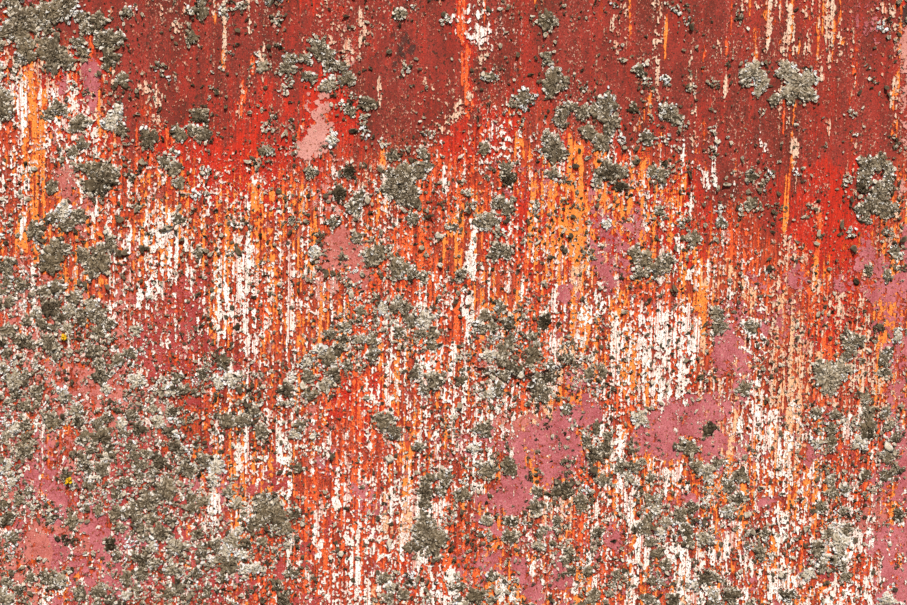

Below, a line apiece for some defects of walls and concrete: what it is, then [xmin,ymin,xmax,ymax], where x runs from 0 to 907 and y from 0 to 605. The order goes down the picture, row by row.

peeling [315,0,379,69]
peeling [129,44,198,133]
peeling [223,34,292,135]
peeling [707,68,737,107]
peeling [756,79,807,194]